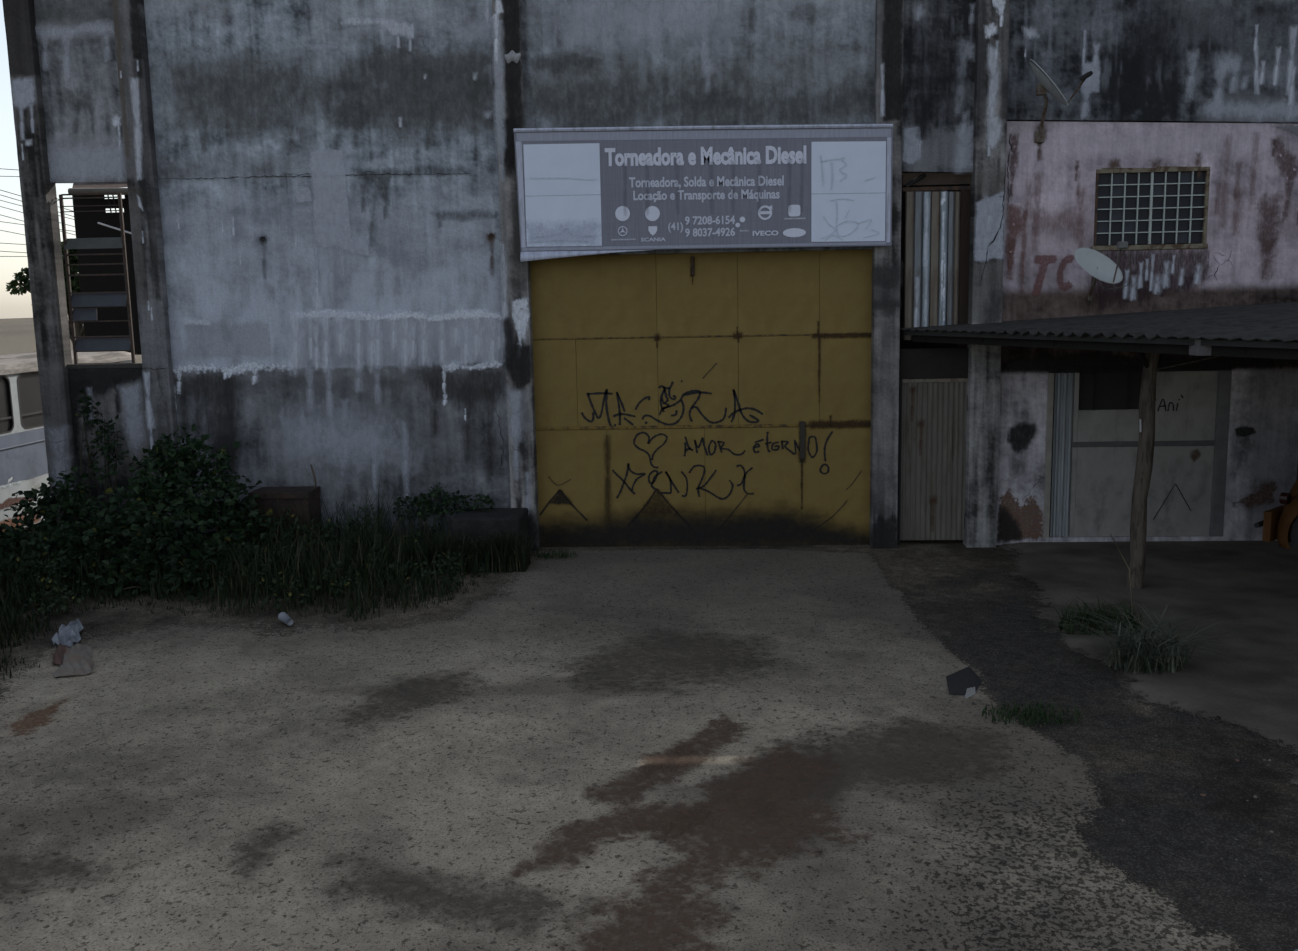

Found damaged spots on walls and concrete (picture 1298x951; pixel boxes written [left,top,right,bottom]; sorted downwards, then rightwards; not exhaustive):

peeling [985,0,1027,292]
spalling [997,489,1044,541]